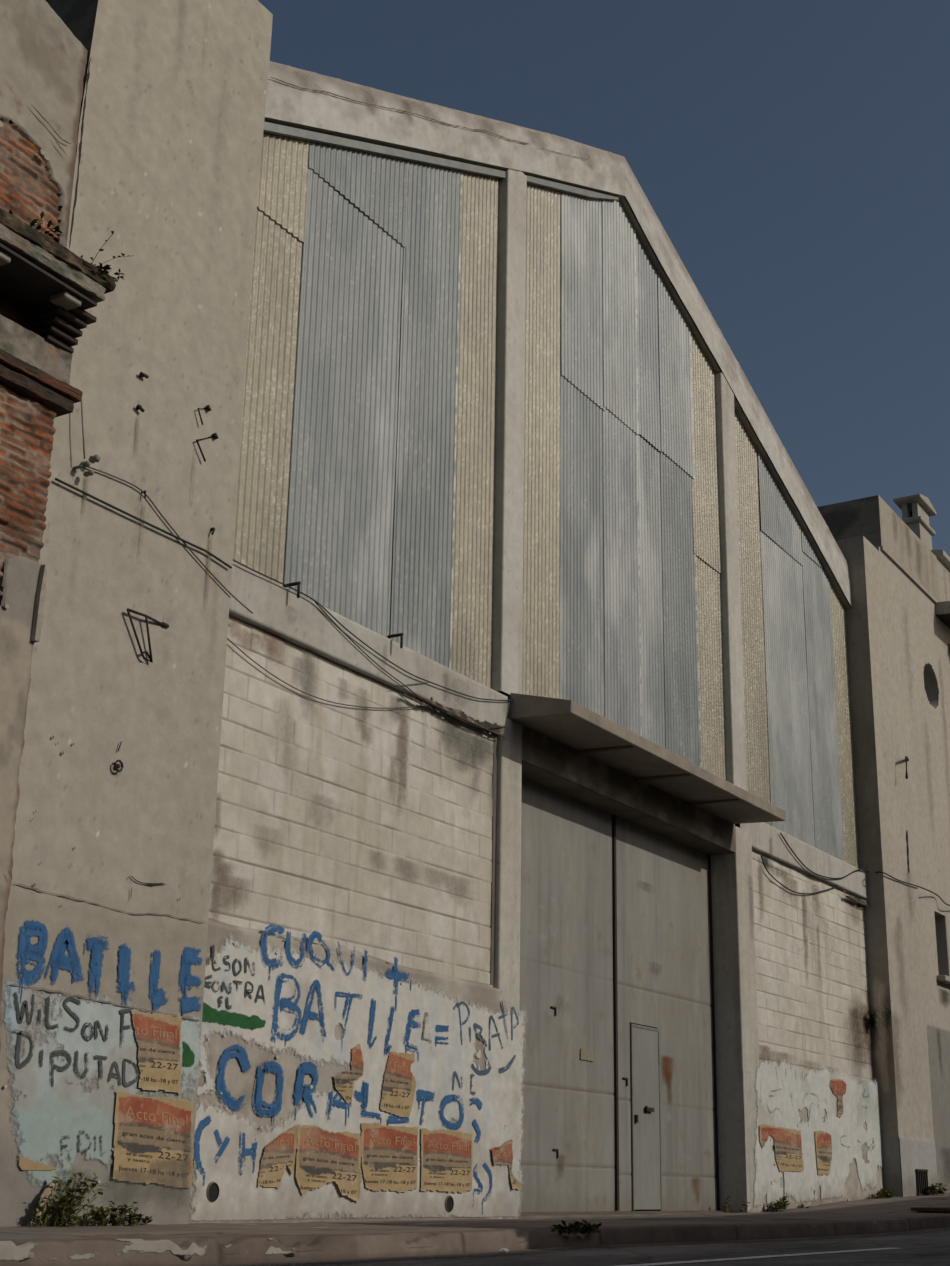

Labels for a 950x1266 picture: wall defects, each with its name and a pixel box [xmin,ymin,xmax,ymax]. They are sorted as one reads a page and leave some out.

spalling [0,118,63,243]
leakage [396,705,498,809]